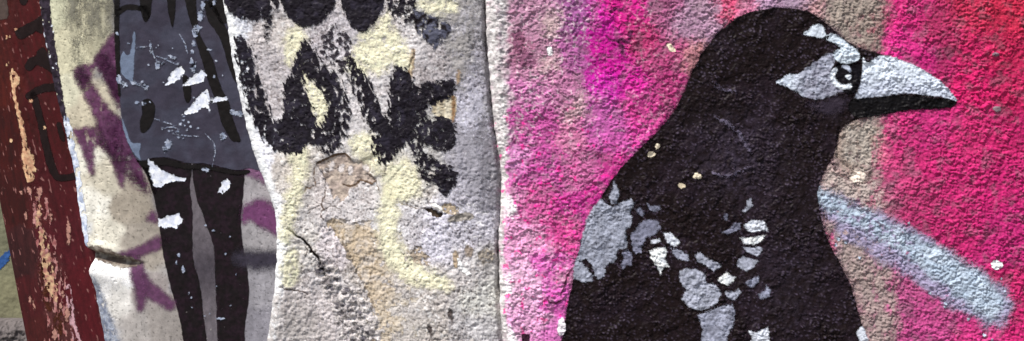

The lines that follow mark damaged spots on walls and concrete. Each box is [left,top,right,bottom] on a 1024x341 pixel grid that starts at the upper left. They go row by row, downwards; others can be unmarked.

crack [290,167,340,276]
spalling [317,151,379,202]